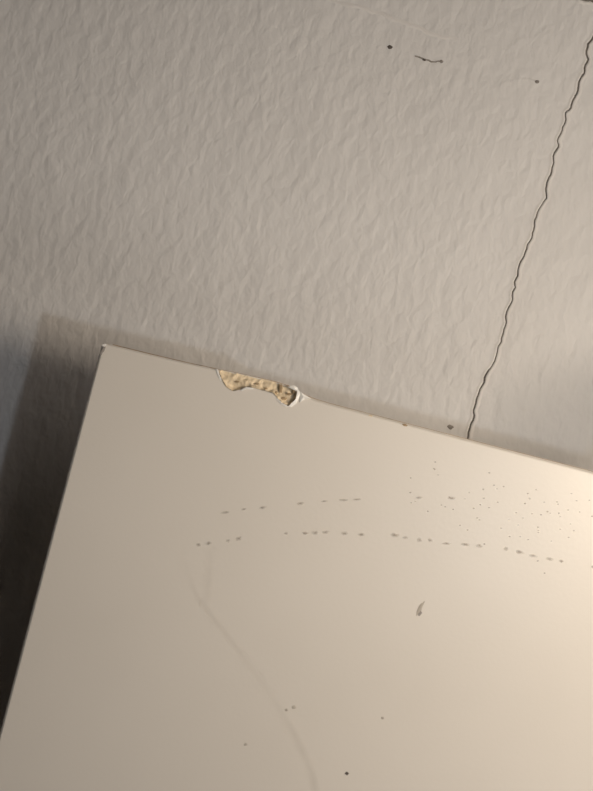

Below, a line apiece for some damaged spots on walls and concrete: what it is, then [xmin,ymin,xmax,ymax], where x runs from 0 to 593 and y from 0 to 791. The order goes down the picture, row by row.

crack [576,0,593,8]
crack [464,30,593,440]
spalling [216,369,309,407]